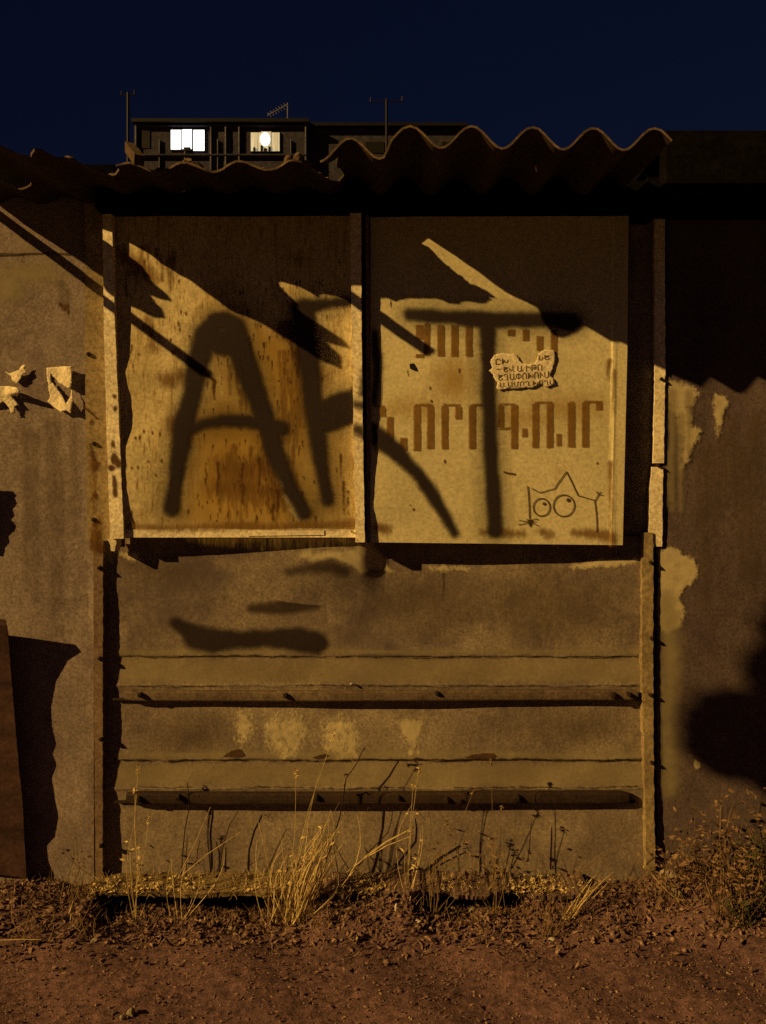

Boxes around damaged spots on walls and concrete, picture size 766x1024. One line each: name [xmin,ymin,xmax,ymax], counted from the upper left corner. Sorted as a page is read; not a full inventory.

peeling [666,380,701,485]